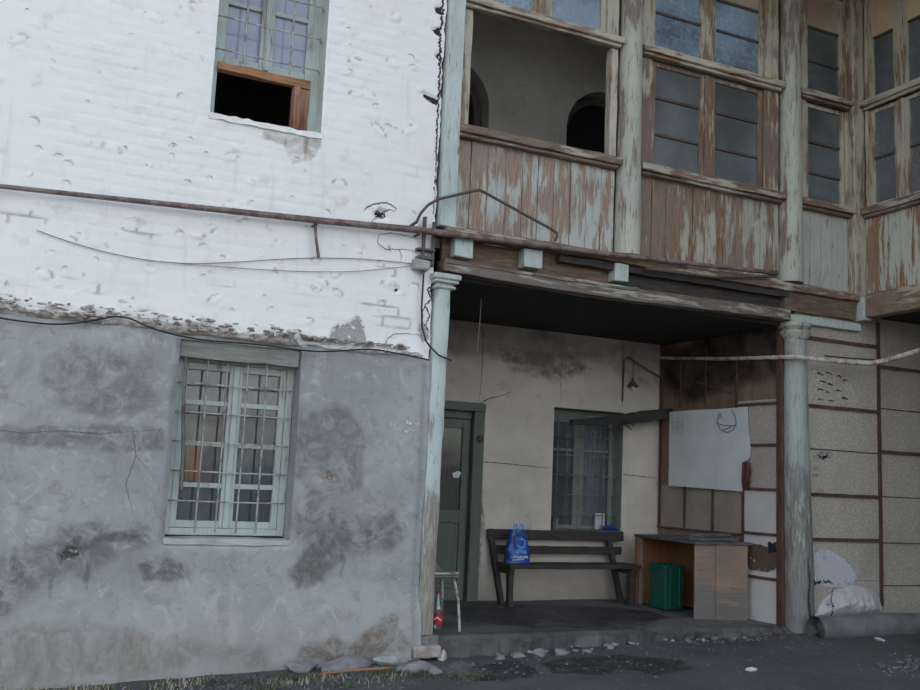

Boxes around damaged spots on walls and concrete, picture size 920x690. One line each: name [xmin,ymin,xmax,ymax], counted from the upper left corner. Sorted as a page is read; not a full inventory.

peeling [0,295,410,350]
crack [1,426,161,515]
spalling [814,549,888,616]